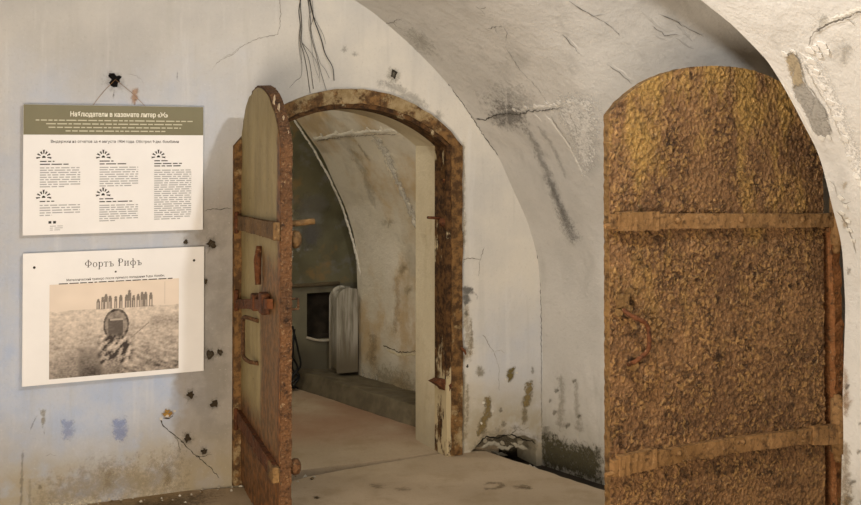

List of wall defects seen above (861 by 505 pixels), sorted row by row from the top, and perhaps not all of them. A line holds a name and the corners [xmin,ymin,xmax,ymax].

peeling [523,381,533,407]
crack [161,420,219,478]
spalling [477,397,535,456]
damp [541,433,604,485]